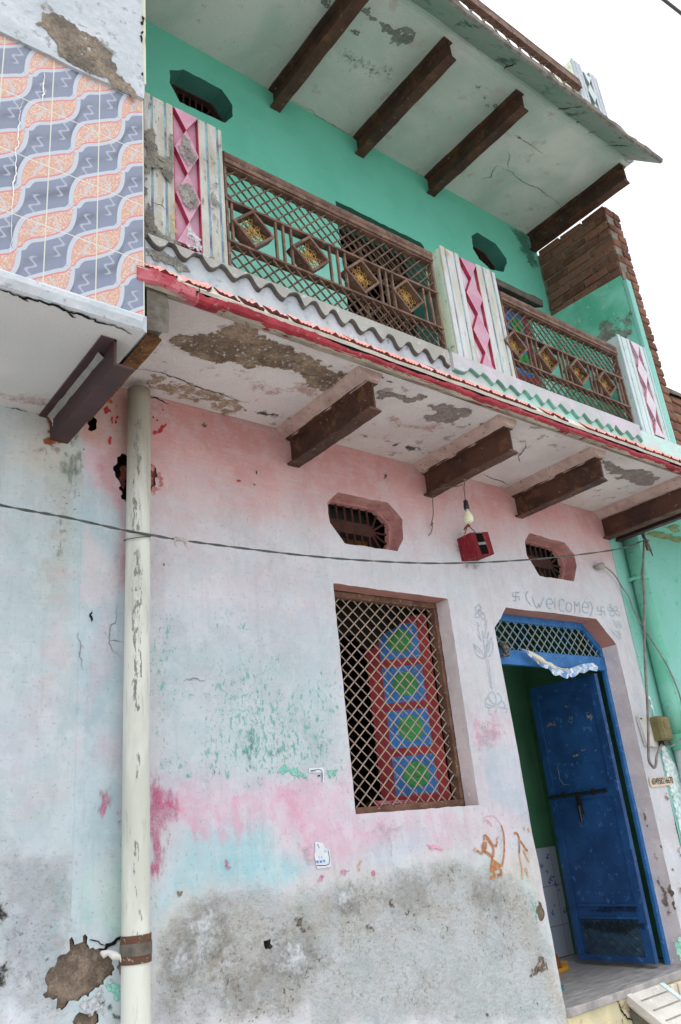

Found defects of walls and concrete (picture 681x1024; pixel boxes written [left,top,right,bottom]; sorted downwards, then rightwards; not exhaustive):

peeling [35,4,136,99]
peeling [144,128,219,272]
crack [482,136,561,206]
peeling [169,322,348,391]
peeling [377,390,483,426]
hole [113,457,127,501]
spalling [151,465,163,495]
peeling [602,460,660,486]
spalling [43,935,121,1024]